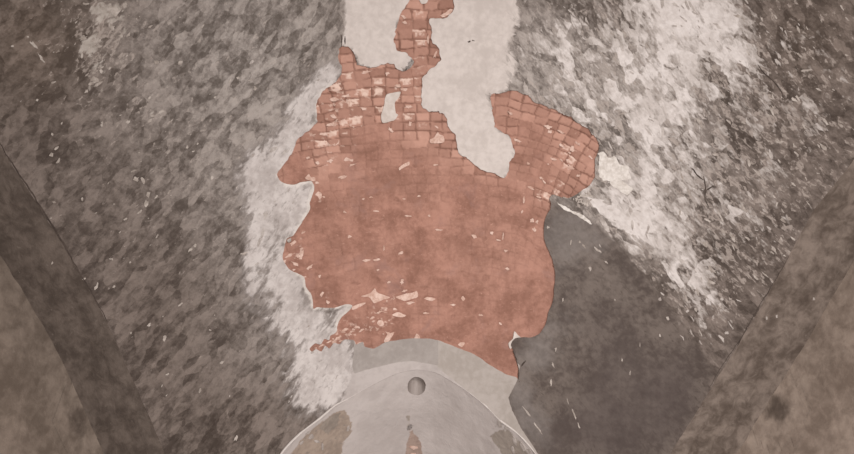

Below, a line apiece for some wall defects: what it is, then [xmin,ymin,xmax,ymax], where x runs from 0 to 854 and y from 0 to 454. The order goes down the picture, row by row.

peeling [53,0,188,238]
spalling [210,0,633,454]
damp [485,0,854,454]